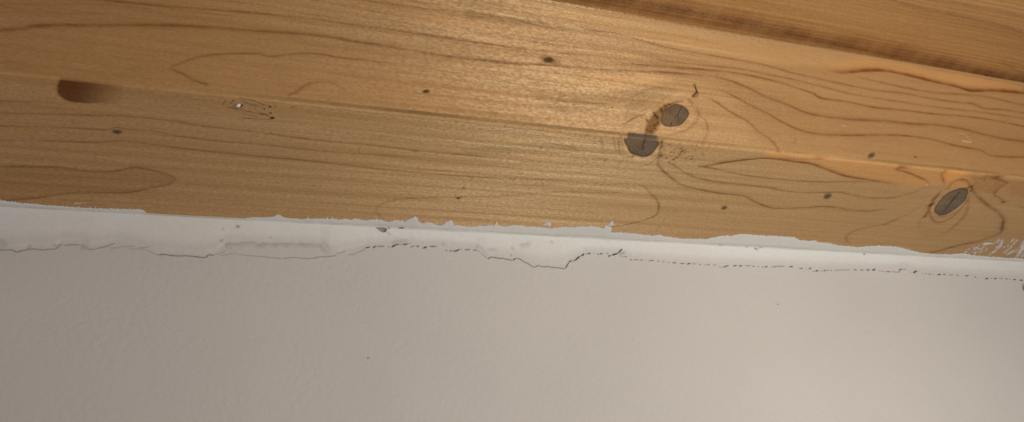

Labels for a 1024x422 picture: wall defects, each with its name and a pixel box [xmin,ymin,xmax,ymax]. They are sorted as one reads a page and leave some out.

crack [0,243,1023,281]